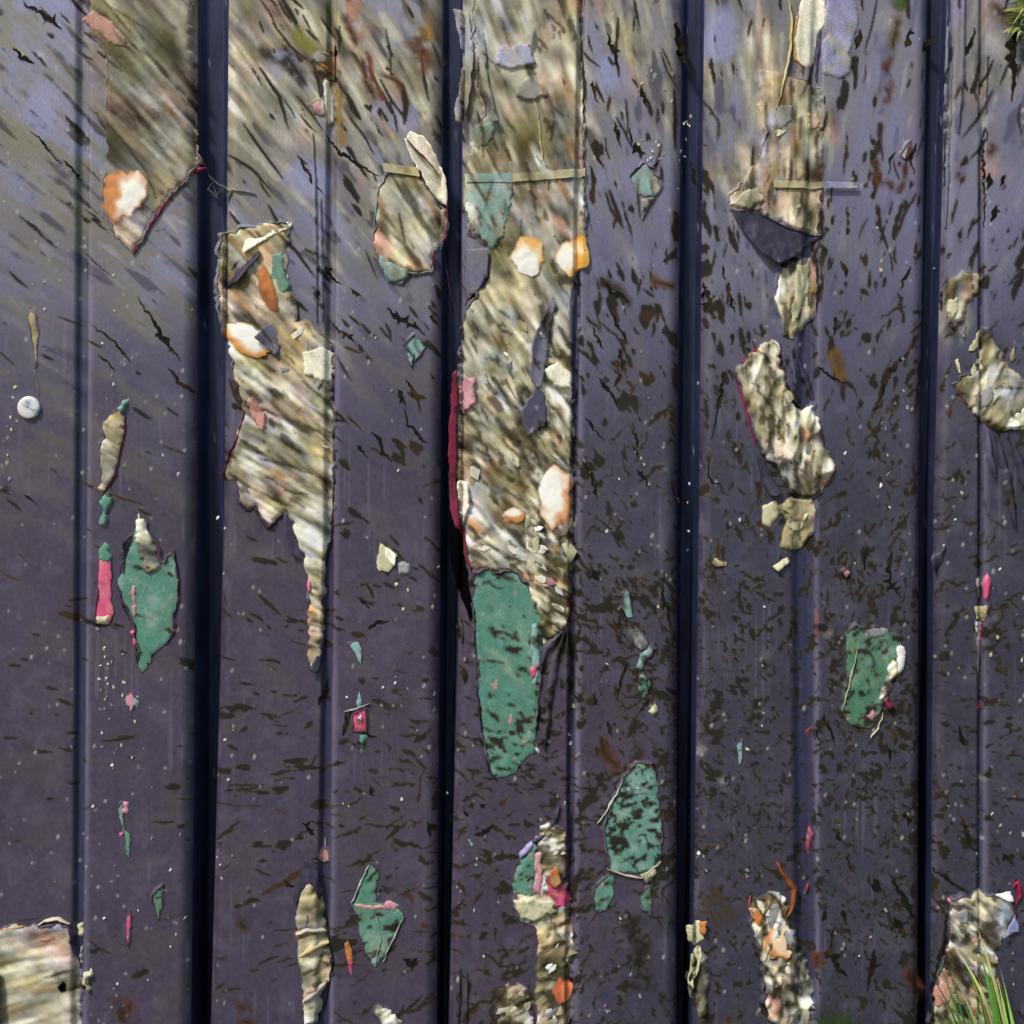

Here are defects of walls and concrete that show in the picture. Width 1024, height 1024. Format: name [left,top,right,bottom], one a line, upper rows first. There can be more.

peeling [82,0,209,256]
peeling [213,219,338,674]
peeling [365,0,590,780]
peeling [726,0,859,572]
peeling [939,270,1024,438]
peeling [93,514,182,723]
peeling [0,917,94,1024]
peeling [293,836,405,1024]
peeling [494,820,582,1024]
peeling [589,760,664,918]
peeling [746,862,817,1024]
peeling [926,880,1023,1024]